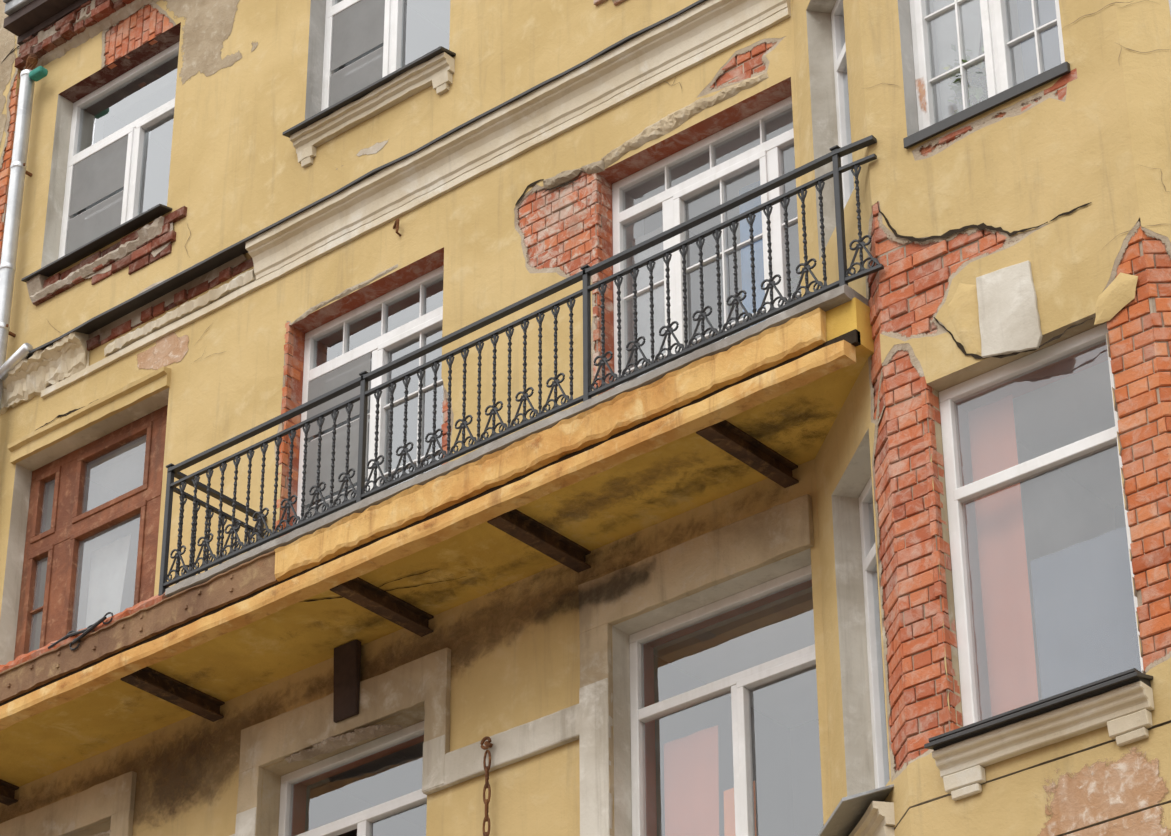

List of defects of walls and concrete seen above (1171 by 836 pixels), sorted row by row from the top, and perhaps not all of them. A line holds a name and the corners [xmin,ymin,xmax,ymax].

flaking render [101,0,258,85]
flaking render [514,36,786,398]
crack [877,201,1092,242]
spalling [1103,221,1171,291]
crack [934,317,1093,359]
damp [360,560,648,682]
spalling [875,502,904,718]
damp [0,704,278,823]
spalling [890,746,934,781]
peeling [1037,746,1171,836]